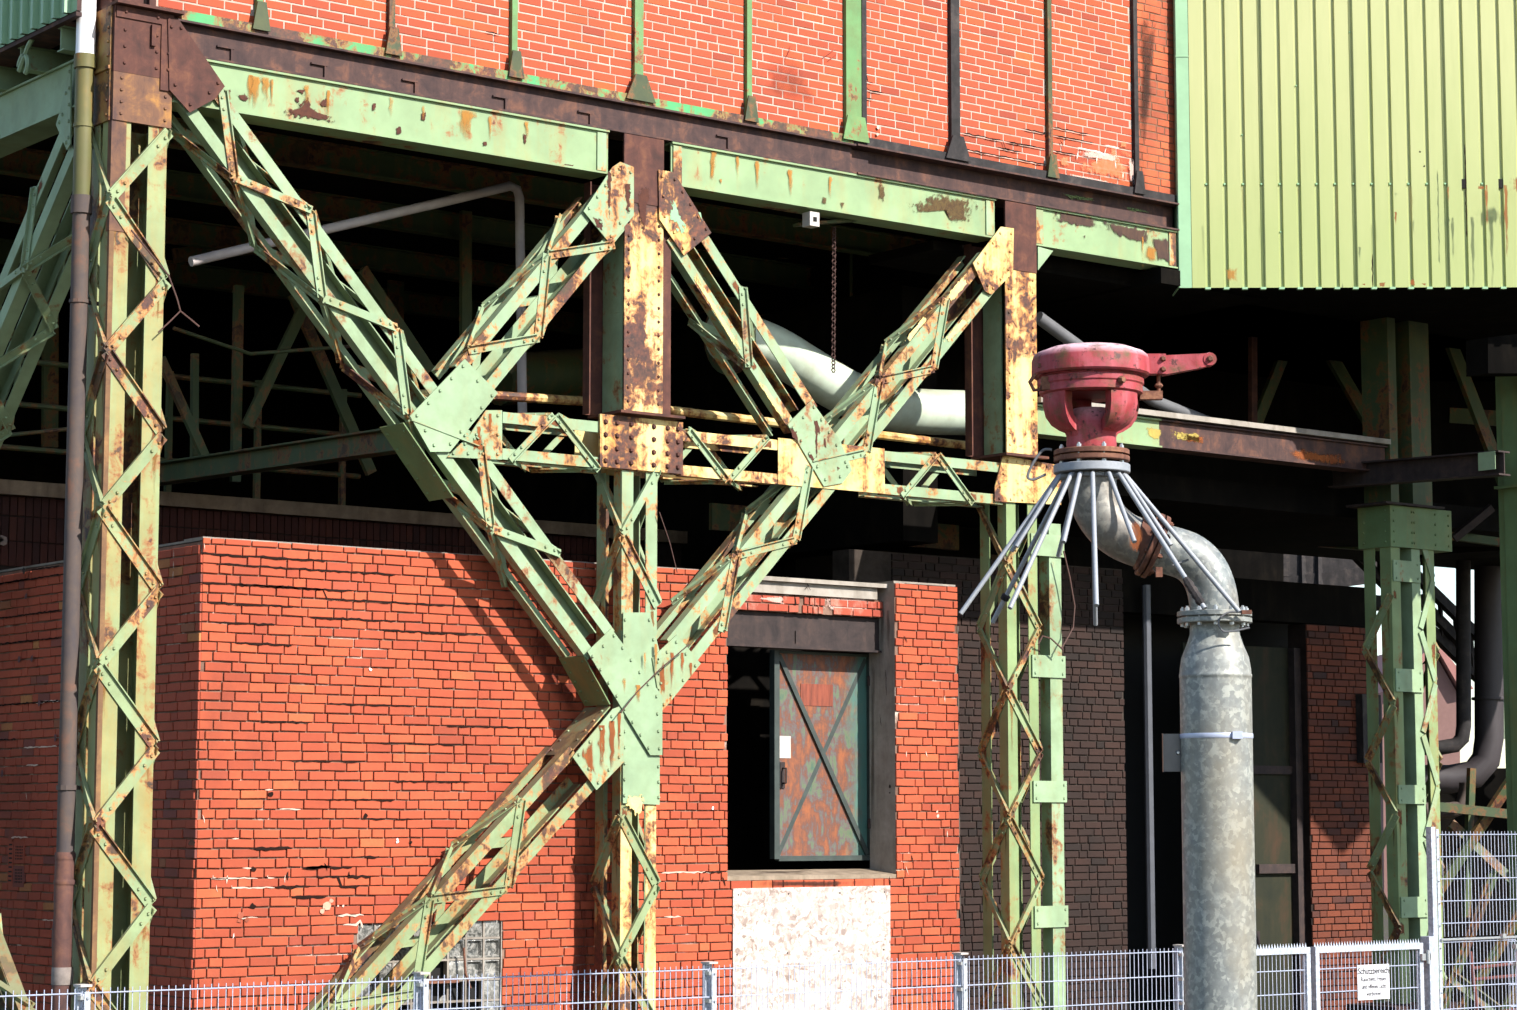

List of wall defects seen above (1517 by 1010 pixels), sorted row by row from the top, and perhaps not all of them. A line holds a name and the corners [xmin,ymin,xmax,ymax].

rust [593,166,649,232]
rust [1478,178,1517,252]
rust [1131,523,1142,550]
crack [242,703,531,919]